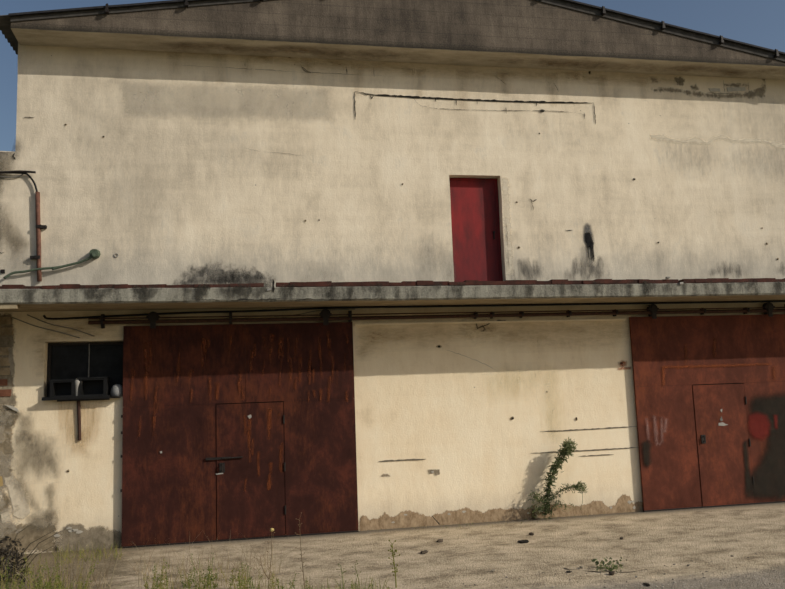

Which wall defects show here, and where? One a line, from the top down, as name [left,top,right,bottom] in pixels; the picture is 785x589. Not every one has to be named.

crack [182,65,596,124]
flaking render [652,77,766,99]
damp [180,265,272,300]
flaking render [0,314,122,556]
flaking render [360,494,643,531]